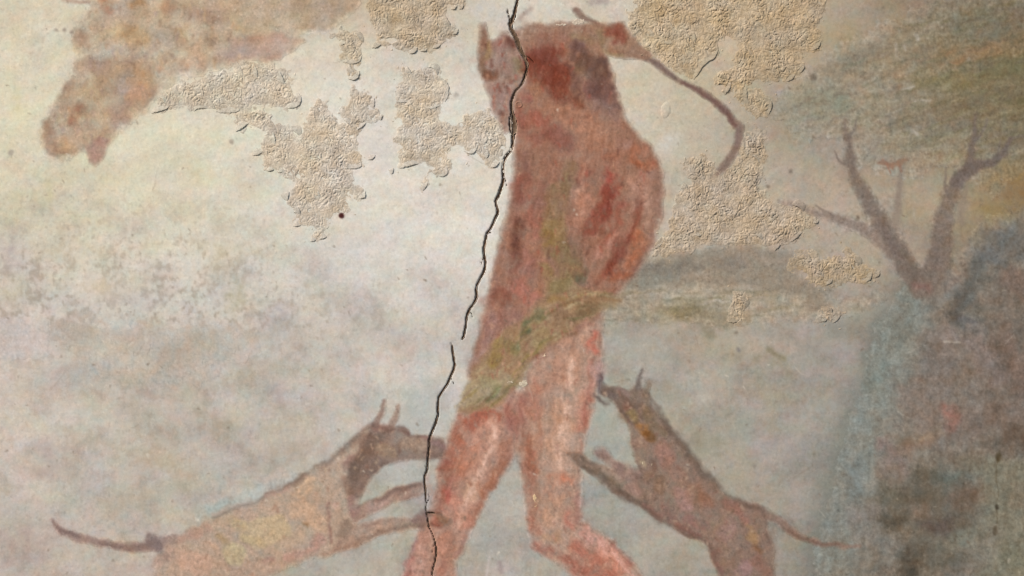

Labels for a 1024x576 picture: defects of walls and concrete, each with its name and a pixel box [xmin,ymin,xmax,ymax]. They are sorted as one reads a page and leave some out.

flaking render [151,0,513,242]
crack [423,0,529,575]
flaking render [625,0,880,291]